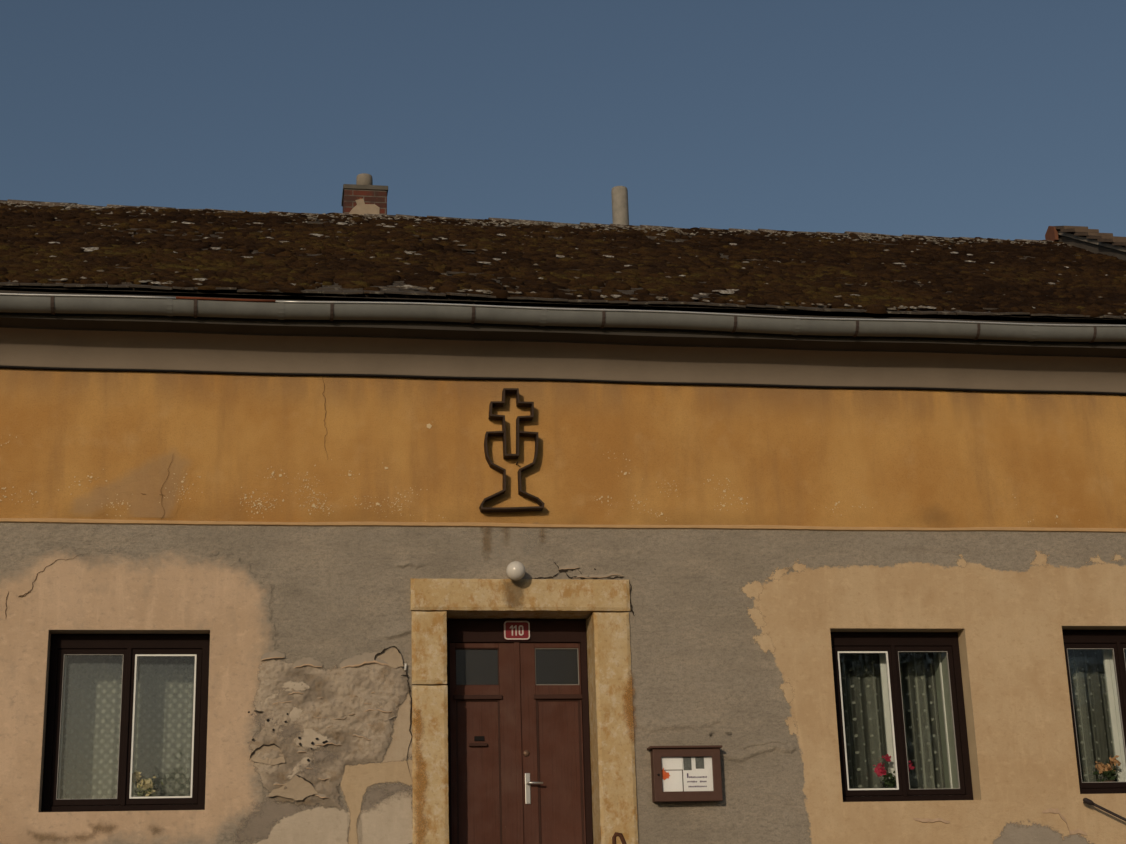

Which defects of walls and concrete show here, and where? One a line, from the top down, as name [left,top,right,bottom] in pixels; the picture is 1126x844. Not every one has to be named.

crack [5,554,80,615]
flaking render [248,646,410,811]
flaking render [993,808,1093,844]